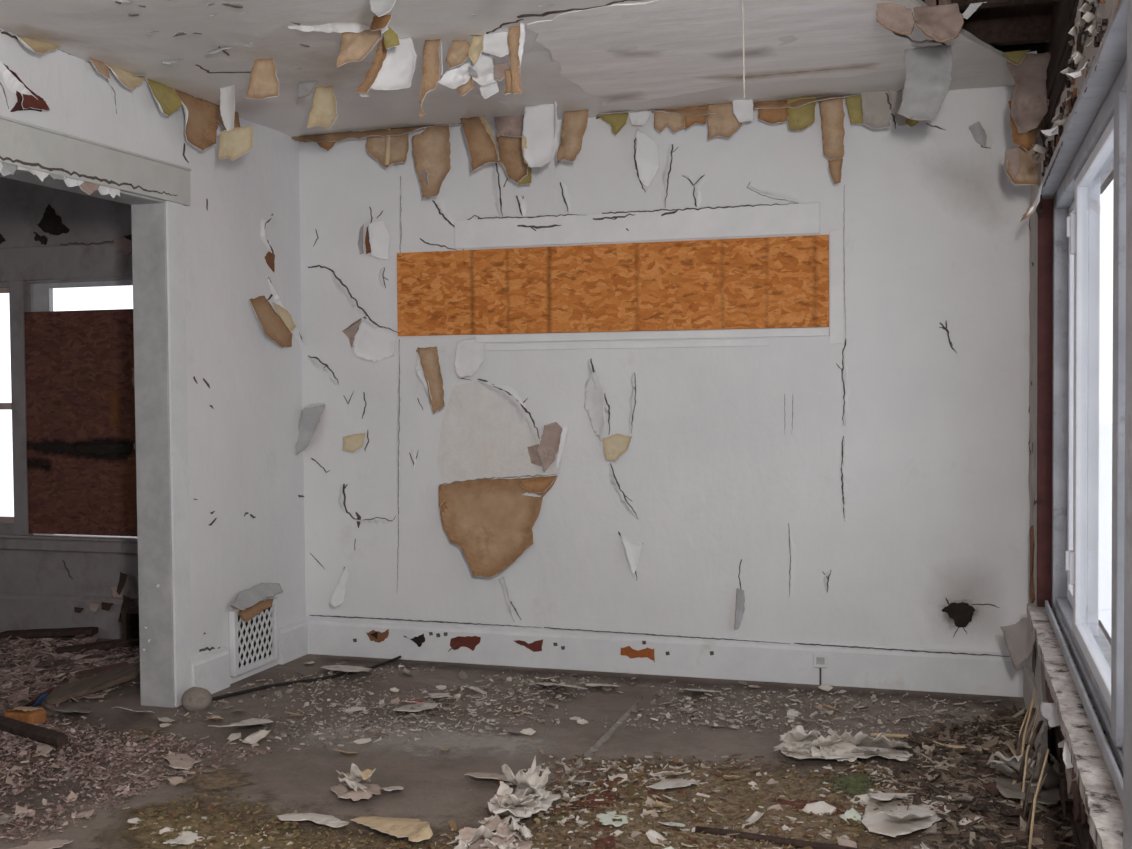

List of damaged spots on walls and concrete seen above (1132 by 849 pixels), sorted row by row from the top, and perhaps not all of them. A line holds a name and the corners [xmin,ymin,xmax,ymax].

peeling [0,61,50,112]
peeling [88,57,279,163]
flaking render [291,0,989,200]
peeling [1003,0,1108,230]
crack [260,214,275,272]
crack [378,144,798,289]
crack [308,265,417,587]
crack [477,379,540,444]
crack [628,372,636,434]
crack [836,264,851,522]
spalling [404,632,481,652]
spalling [620,641,670,663]